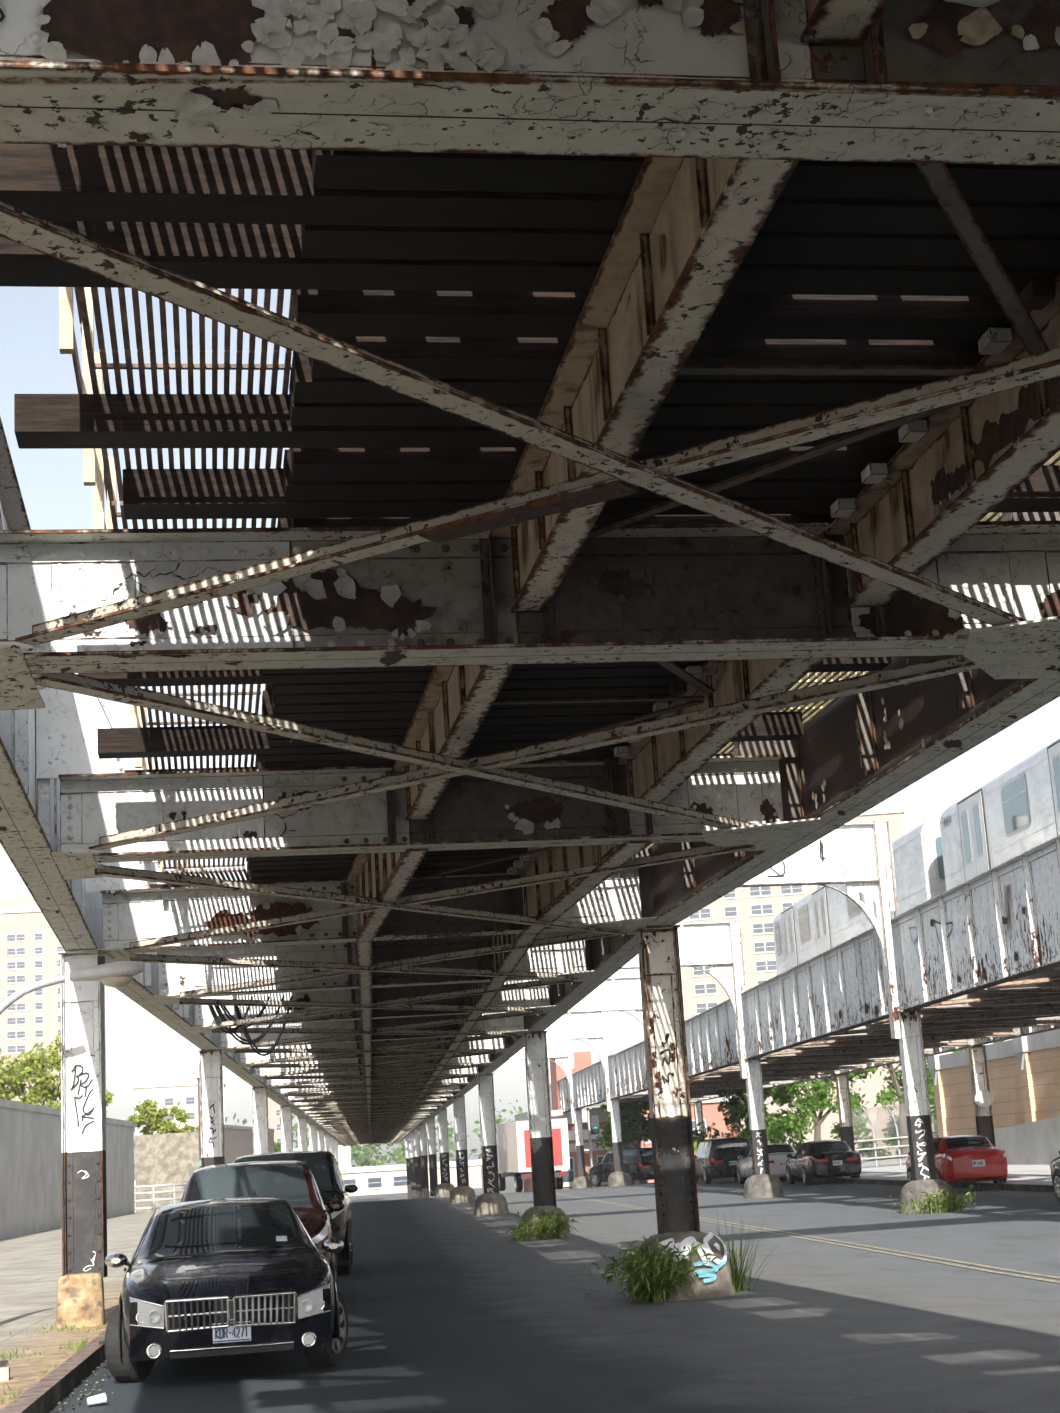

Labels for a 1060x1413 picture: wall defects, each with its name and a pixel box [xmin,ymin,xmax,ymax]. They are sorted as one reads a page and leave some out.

peeling [532,0,745,56]
peeling [908,0,1060,60]
peeling [174,87,278,120]
peeling [927,376,1060,506]
peeling [225,567,438,666]
peeling [858,590,970,649]
peeling [505,796,565,835]
peeling [203,900,319,939]